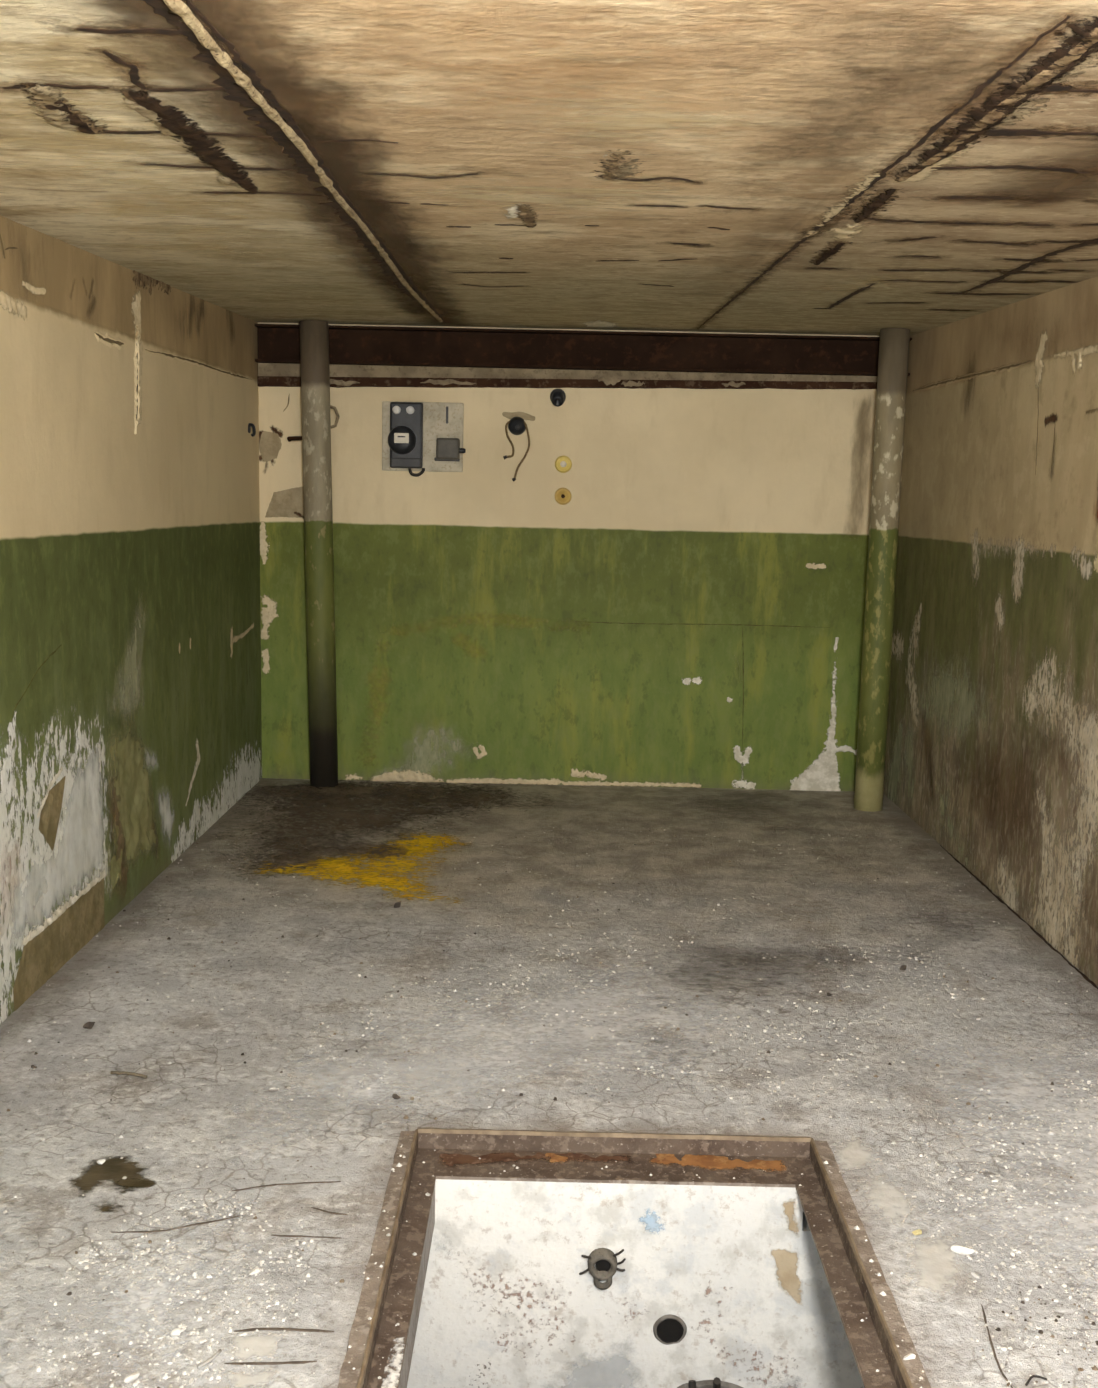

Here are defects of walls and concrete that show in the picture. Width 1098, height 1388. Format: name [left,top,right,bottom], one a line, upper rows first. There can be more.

crack [0,0,526,324]
crack [696,14,1098,329]
peeling [970,529,1098,631]
peeling [230,595,279,675]
peeling [790,637,857,791]
flaking render [37,766,65,851]
peeling [185,738,200,806]
flaking render [13,869,106,1011]
water stain [69,1156,156,1212]
rust [439,1153,631,1167]
rust [649,1154,785,1171]